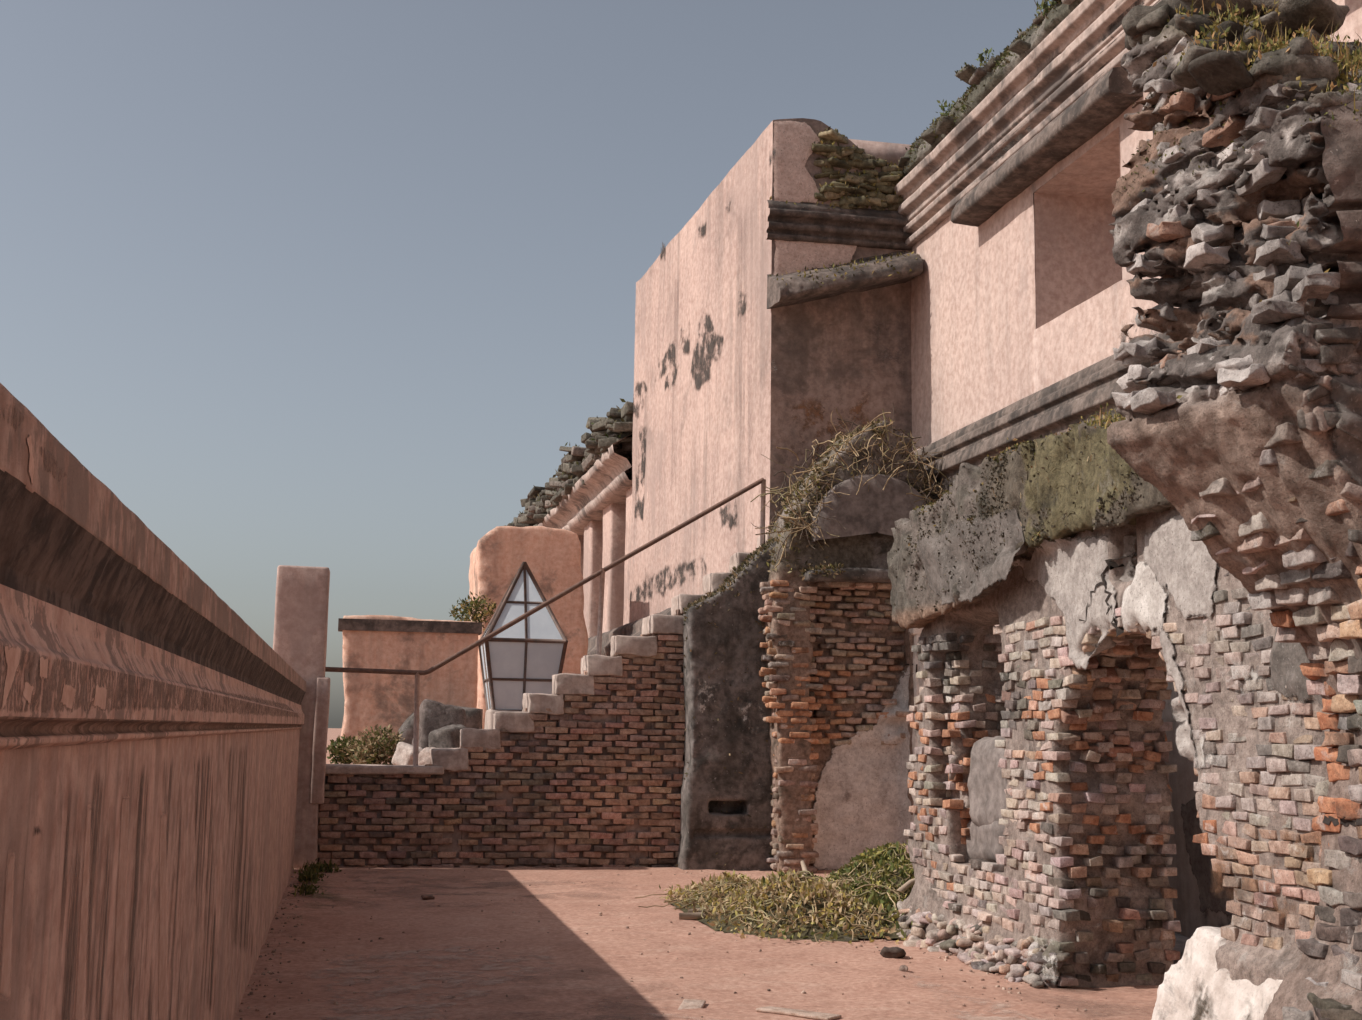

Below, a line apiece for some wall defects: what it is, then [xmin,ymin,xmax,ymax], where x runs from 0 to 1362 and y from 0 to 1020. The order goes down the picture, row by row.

leakage [658,315,723,390]
leakage [633,383,647,520]
crack [1079,553,1137,637]